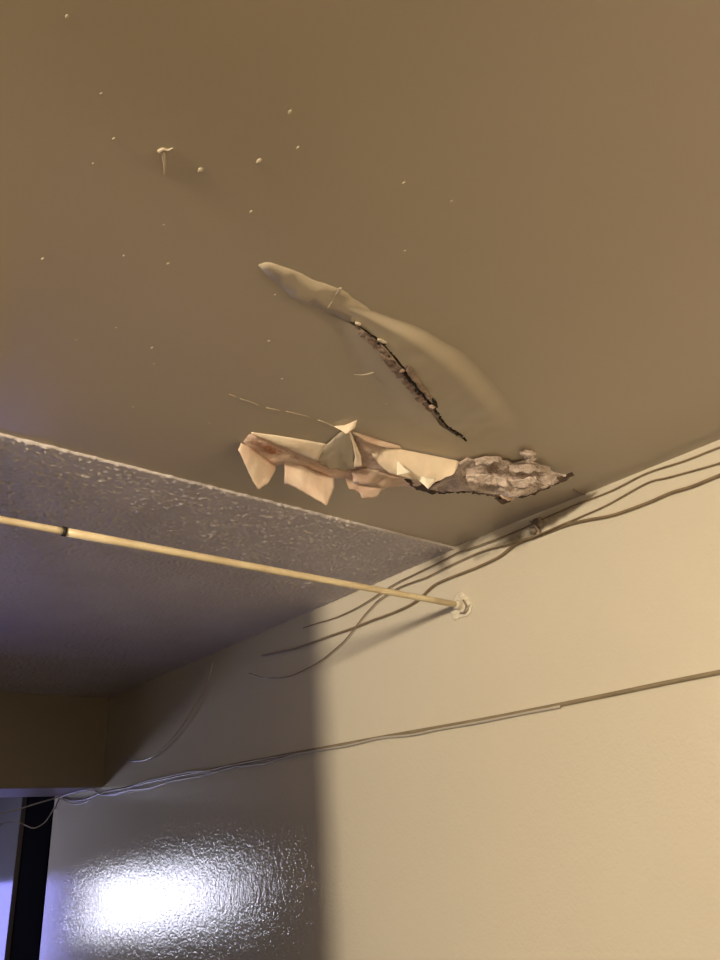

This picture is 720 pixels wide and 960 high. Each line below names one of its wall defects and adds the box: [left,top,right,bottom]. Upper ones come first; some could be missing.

crack [354,321,467,442]
peeling [238,420,574,506]